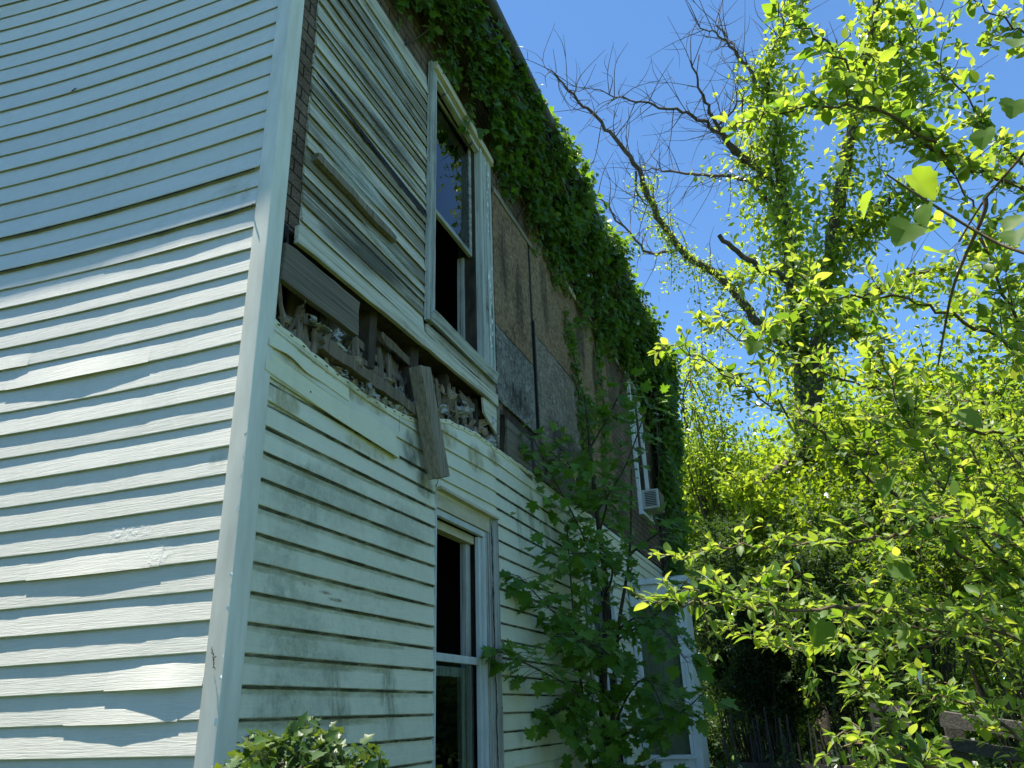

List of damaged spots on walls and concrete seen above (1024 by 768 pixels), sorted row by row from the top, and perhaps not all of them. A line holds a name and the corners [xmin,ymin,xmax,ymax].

spalling [275,280,419,419]
spalling [432,374,500,447]